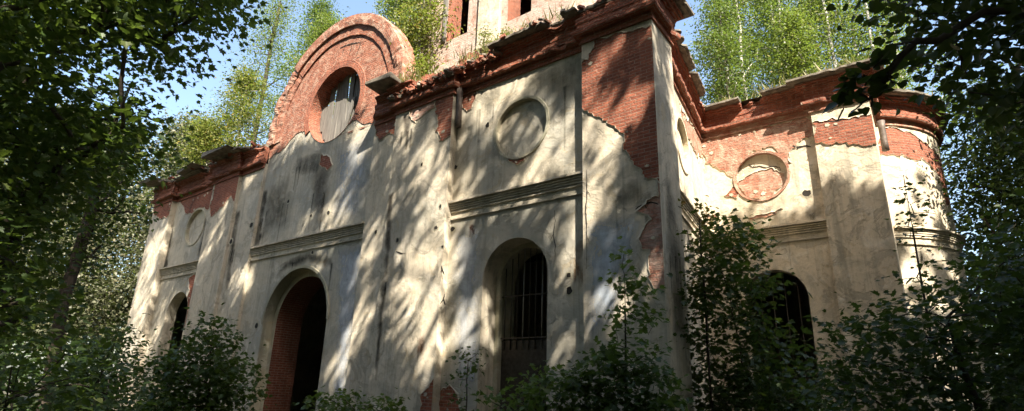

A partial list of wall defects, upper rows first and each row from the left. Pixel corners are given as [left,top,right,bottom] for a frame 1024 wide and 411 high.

flaking render [375,119,396,141]
flaking render [409,91,478,142]
flaking render [581,24,665,291]
flaking render [679,103,951,210]
flaking render [153,176,239,220]
flaking render [419,377,461,411]